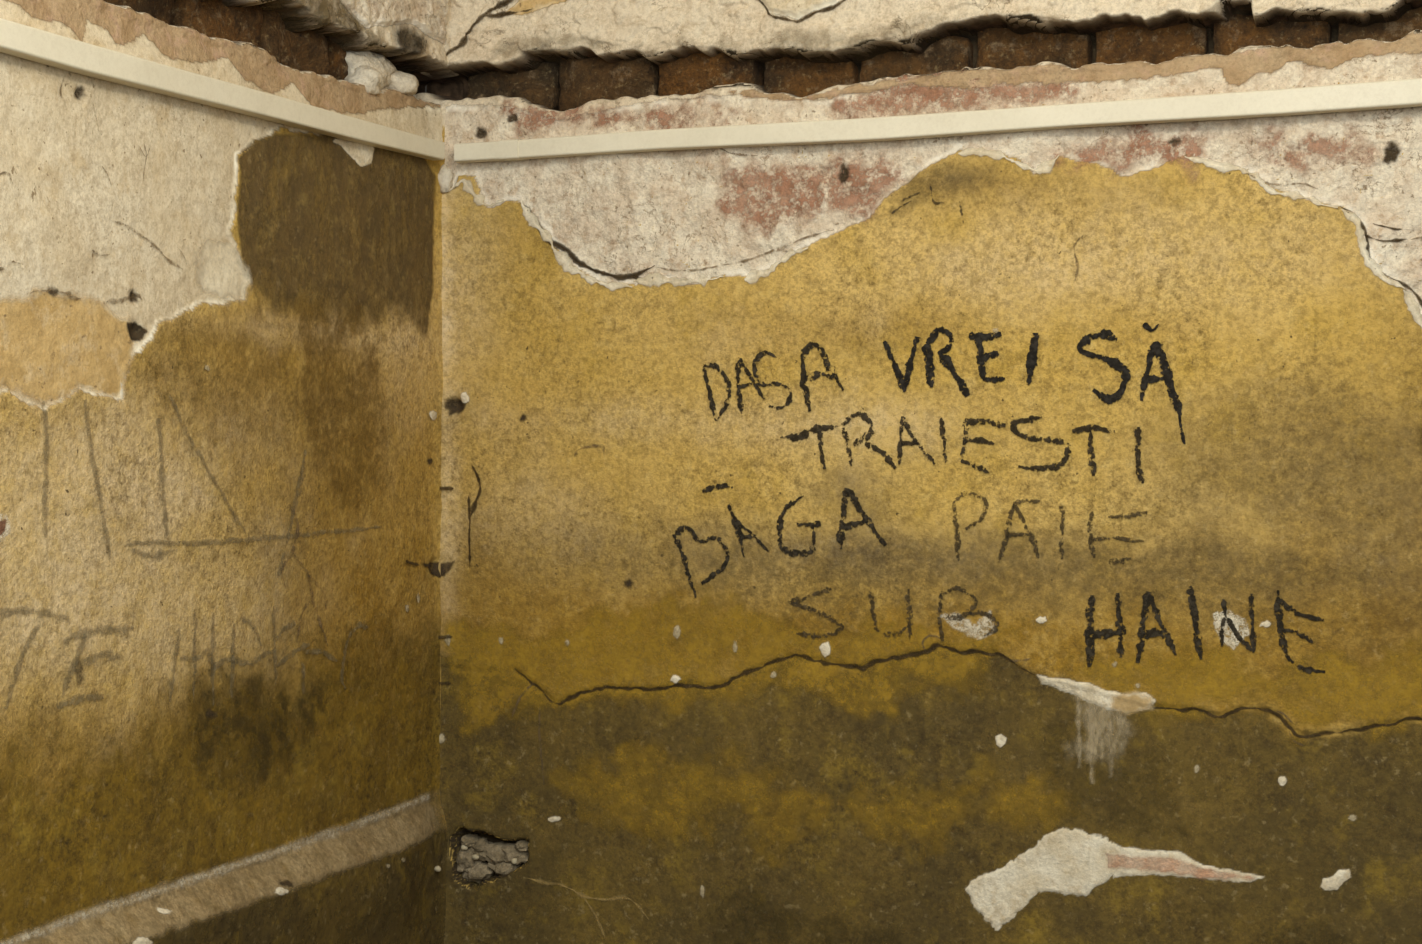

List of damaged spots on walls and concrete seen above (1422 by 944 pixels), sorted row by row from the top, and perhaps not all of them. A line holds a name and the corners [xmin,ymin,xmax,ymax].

crack [758,0,845,23]
peeling [0,0,1422,327]
peeling [0,52,374,411]
water stain [238,134,435,497]
spalling [429,392,469,420]
peeling [941,612,994,639]
water stain [0,598,1422,944]
crack [512,635,1035,783]
peeling [1037,674,1155,713]
crack [1153,707,1422,746]
spalling [434,827,529,886]
peeling [965,827,1263,931]